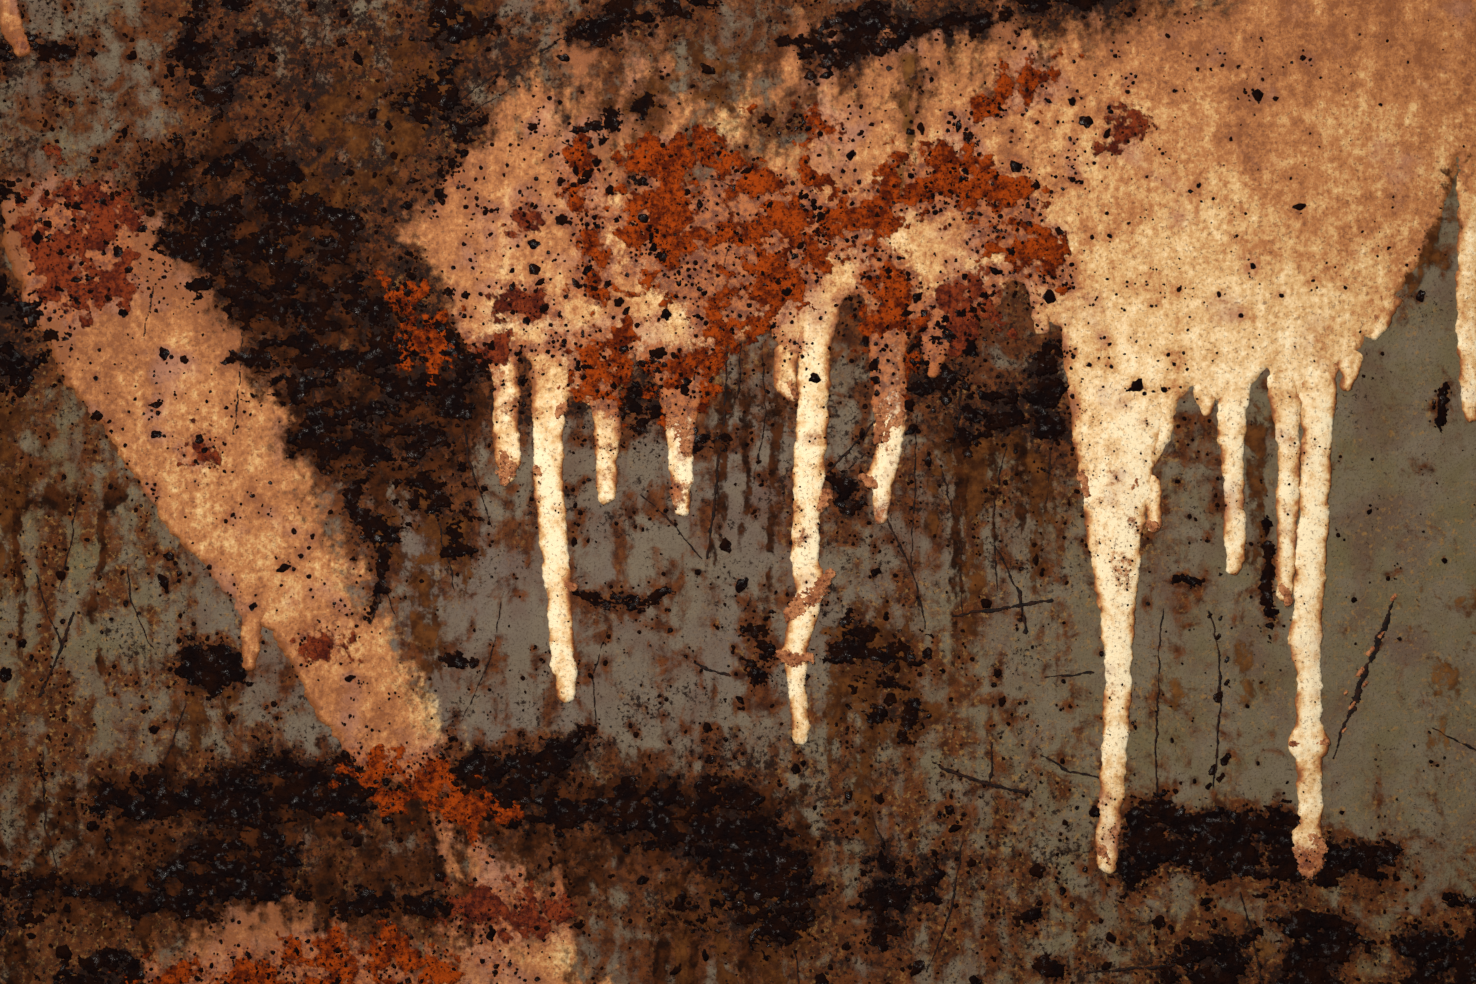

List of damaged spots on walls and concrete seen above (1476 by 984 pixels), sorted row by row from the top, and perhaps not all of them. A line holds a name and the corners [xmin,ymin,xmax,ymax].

rust [1094,267,1226,312]
rust [0,0,1178,984]
rust [975,771,1476,984]